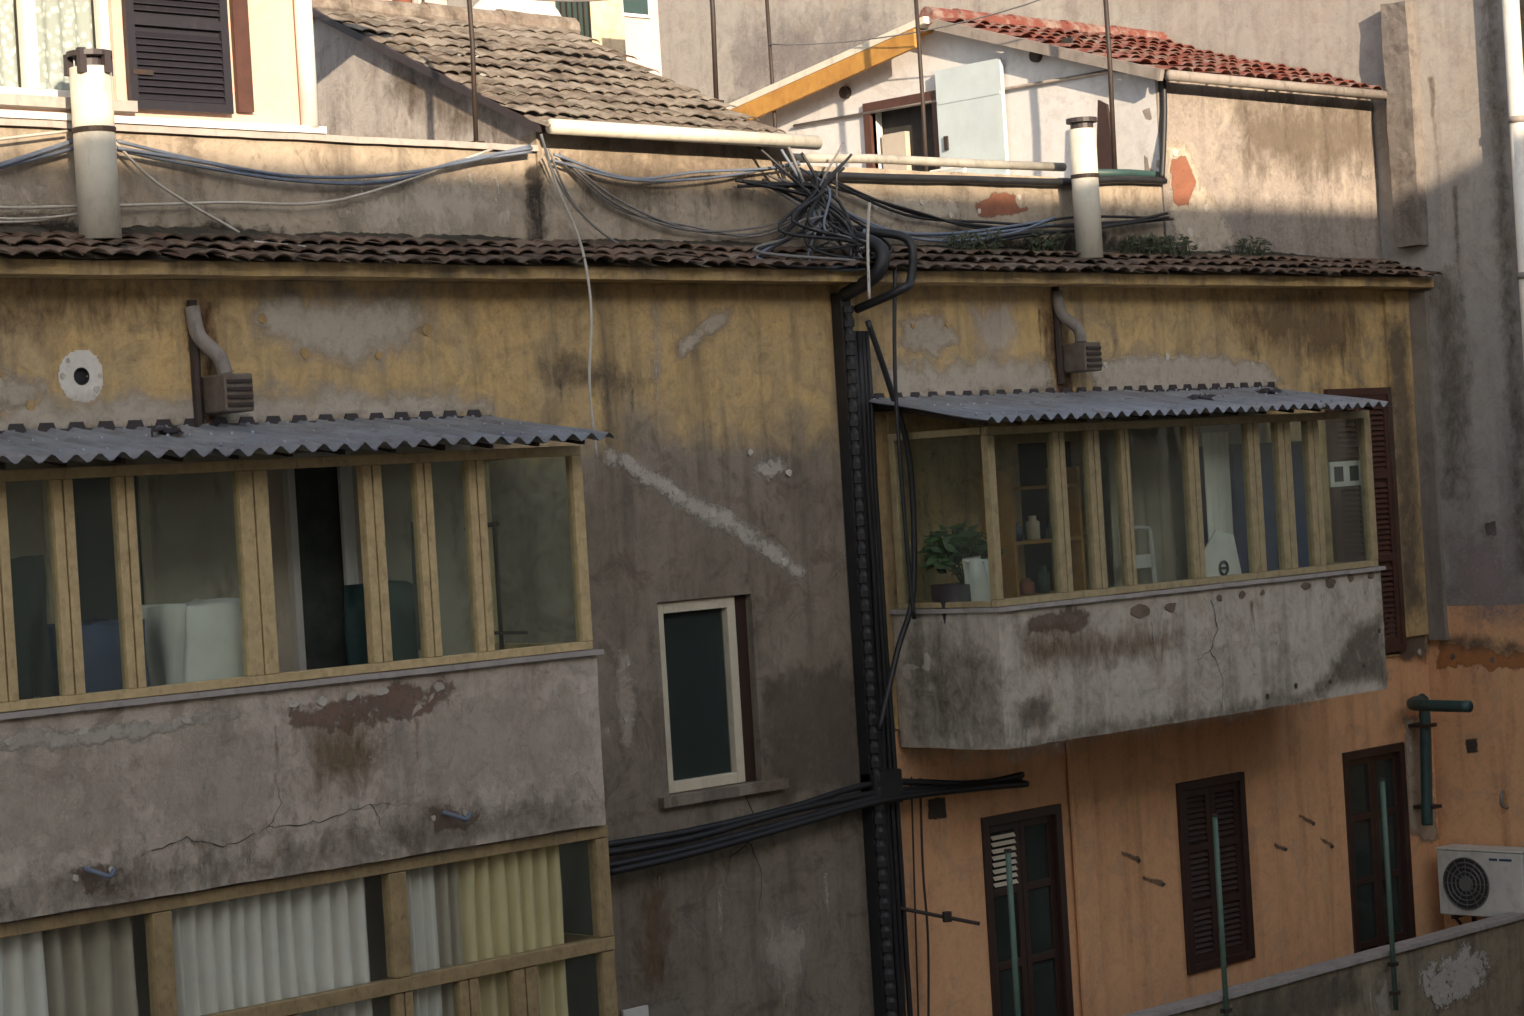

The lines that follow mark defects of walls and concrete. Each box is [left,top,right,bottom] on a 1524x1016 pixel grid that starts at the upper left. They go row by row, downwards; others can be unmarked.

flaking render [870,192,1028,229]
flaking render [1167,142,1237,252]
peeling [1301,571,1374,590]
peeling [1028,607,1089,633]
leakage [1027,632,1167,661]
peeling [1130,603,1176,619]
flaking render [1329,606,1524,684]
flaking render [287,676,454,735]
spalling [1465,738,1478,753]
peeling [1405,715,1438,841]
crack [141,779,411,857]
peeling [1418,940,1491,1011]